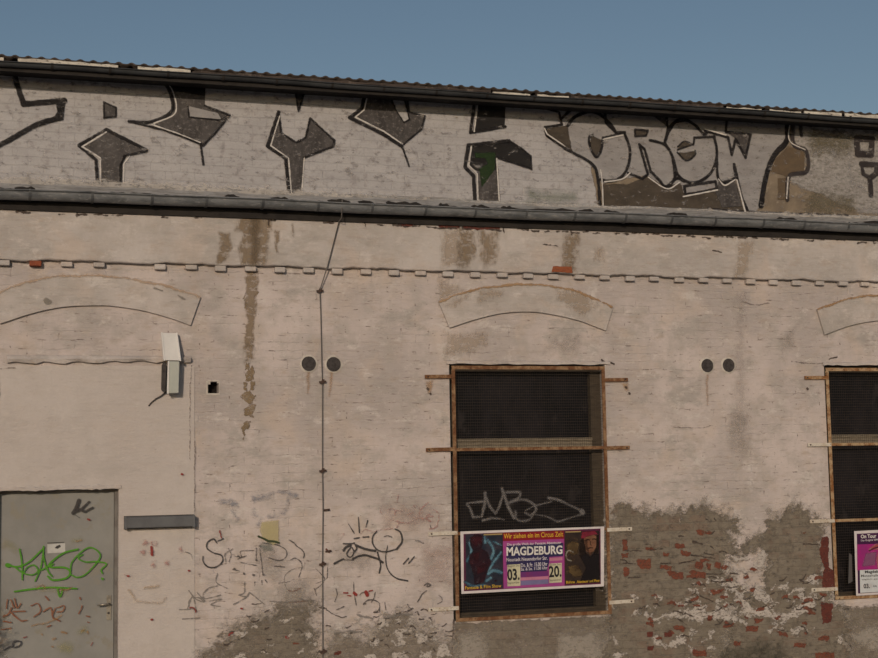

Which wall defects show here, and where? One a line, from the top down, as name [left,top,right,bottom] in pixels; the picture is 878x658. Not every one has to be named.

damp [445,231,497,265]
damp [217,218,279,440]
spalling [198,497,878,658]